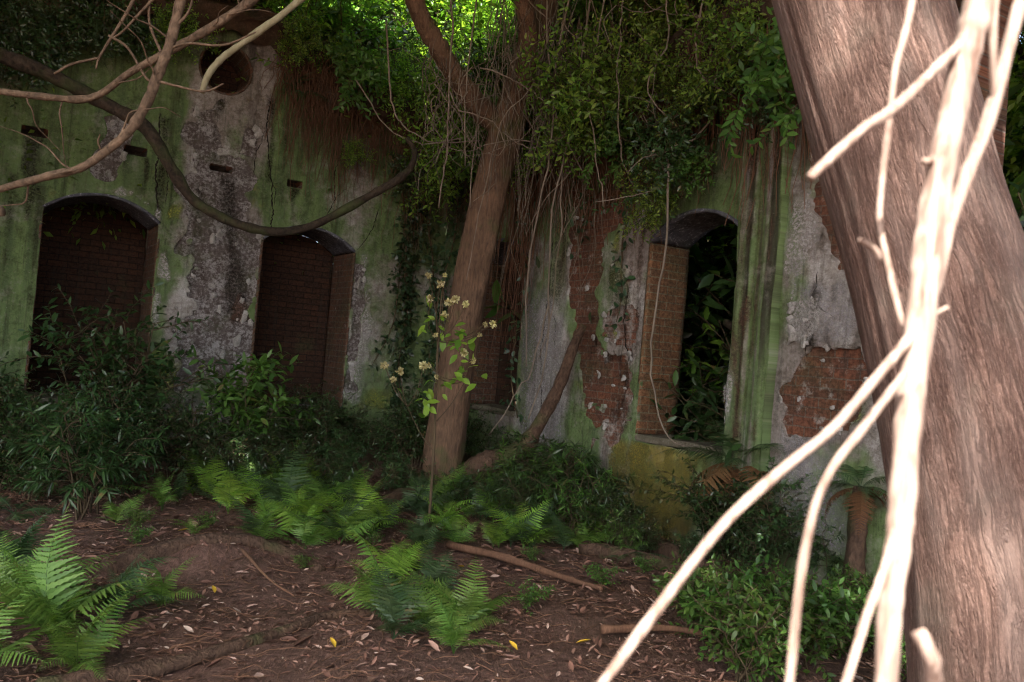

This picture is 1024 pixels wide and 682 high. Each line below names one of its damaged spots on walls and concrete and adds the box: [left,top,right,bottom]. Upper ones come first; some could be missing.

damp [8,136,44,217]
peeling [90,115,133,182]
spalling [172,99,263,394]
flaking render [813,181,844,270]
flaking render [566,175,639,450]
damp [724,295,757,439]
flaking render [779,341,869,437]